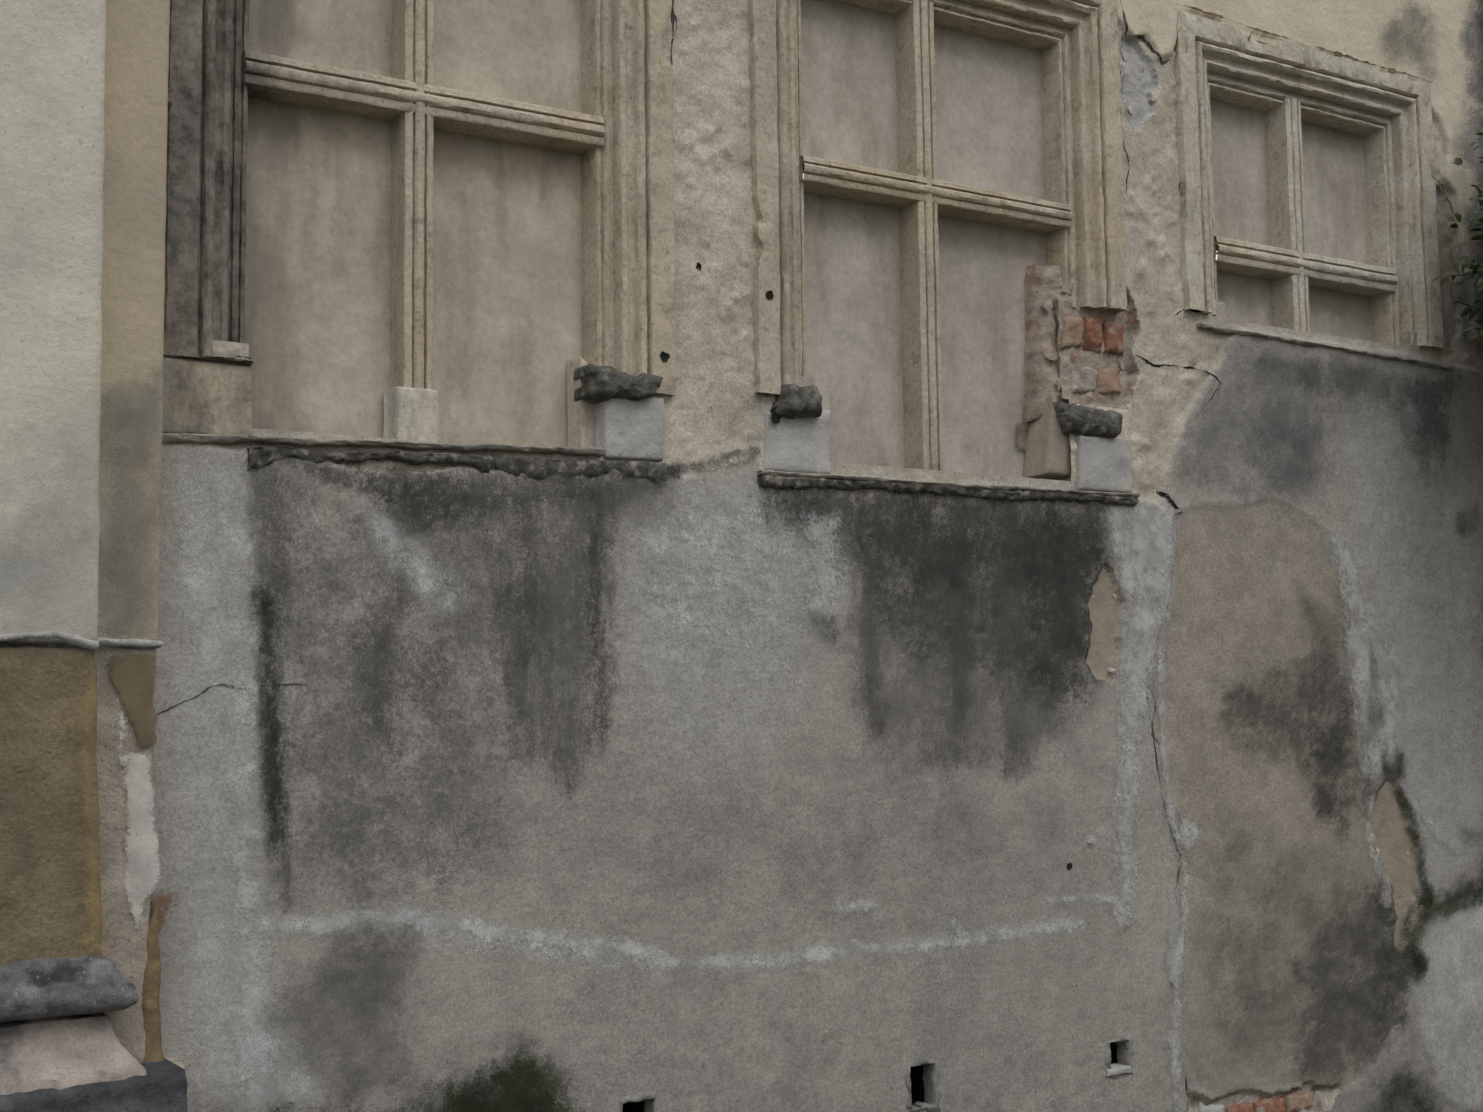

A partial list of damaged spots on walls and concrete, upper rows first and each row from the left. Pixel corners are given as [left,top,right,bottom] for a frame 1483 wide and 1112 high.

crack [669,0,677,65]
crack [1119,0,1432,192]
spalling [1040,283,1140,409]
peeling [0,630,163,927]
leakage [180,466,1131,1106]
spalling [1085,562,1126,687]
crack [1145,491,1185,990]
leakage [1155,652,1189,1112]
leakage [1330,528,1404,780]
spalling [1367,777,1424,956]
spalling [1186,1081,1341,1112]